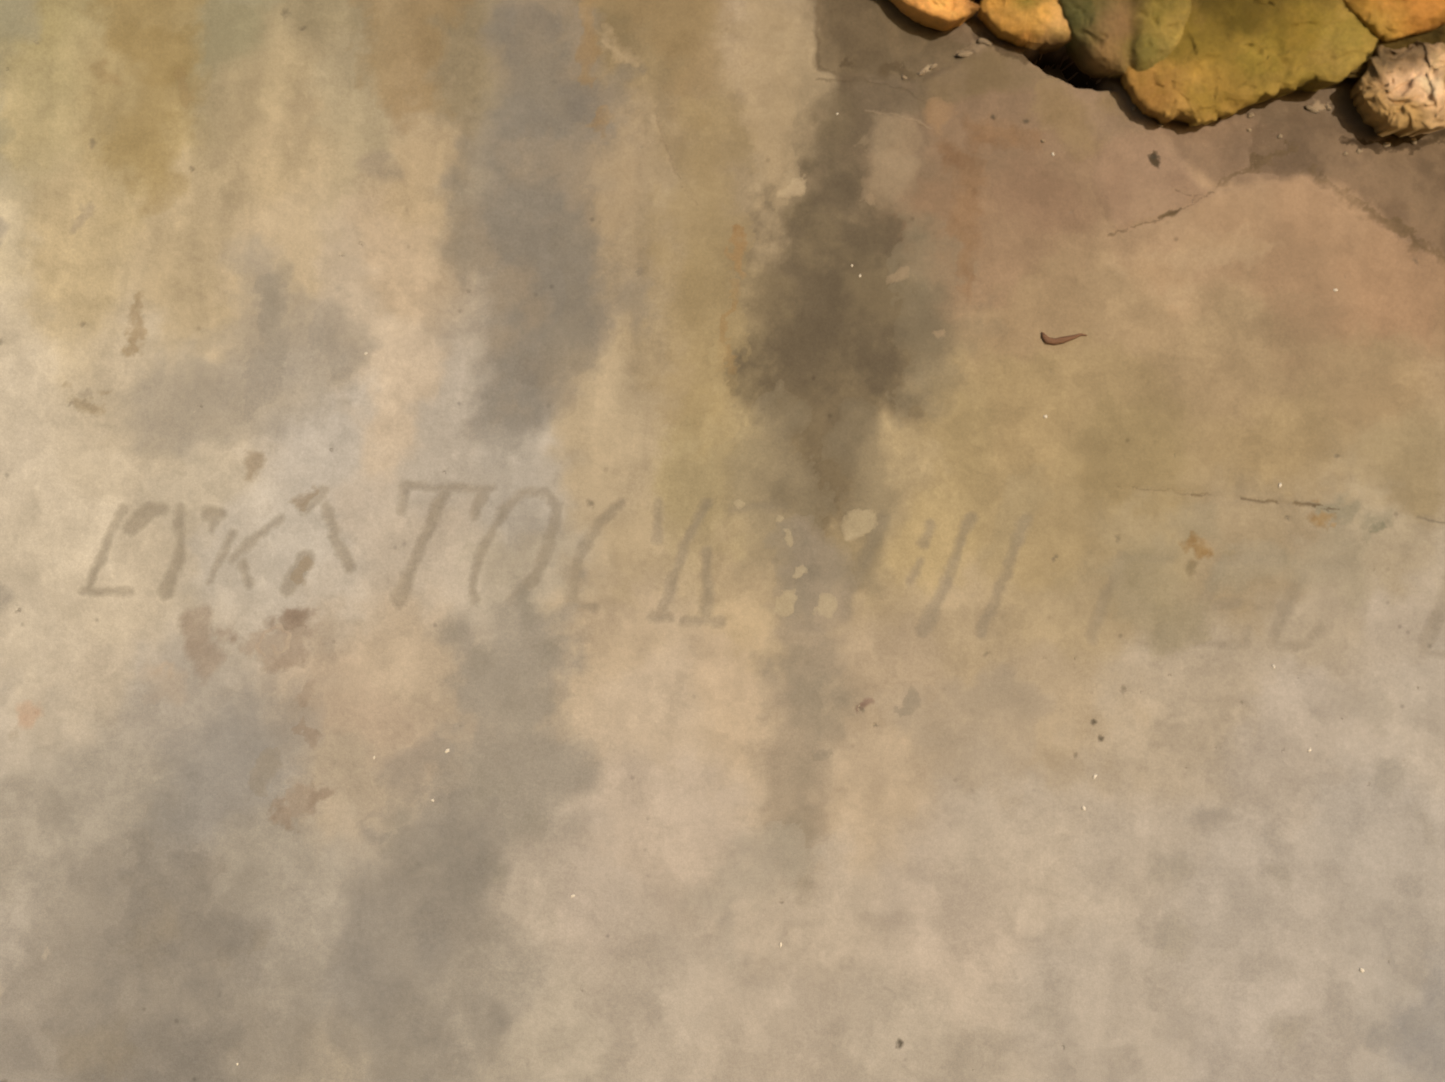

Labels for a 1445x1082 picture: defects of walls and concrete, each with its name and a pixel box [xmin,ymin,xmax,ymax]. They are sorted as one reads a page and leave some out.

water stain [94,18,214,218]
crack [1107,189,1215,237]
water stain [71,226,386,470]
water stain [450,0,1065,975]
crack [1116,485,1340,514]